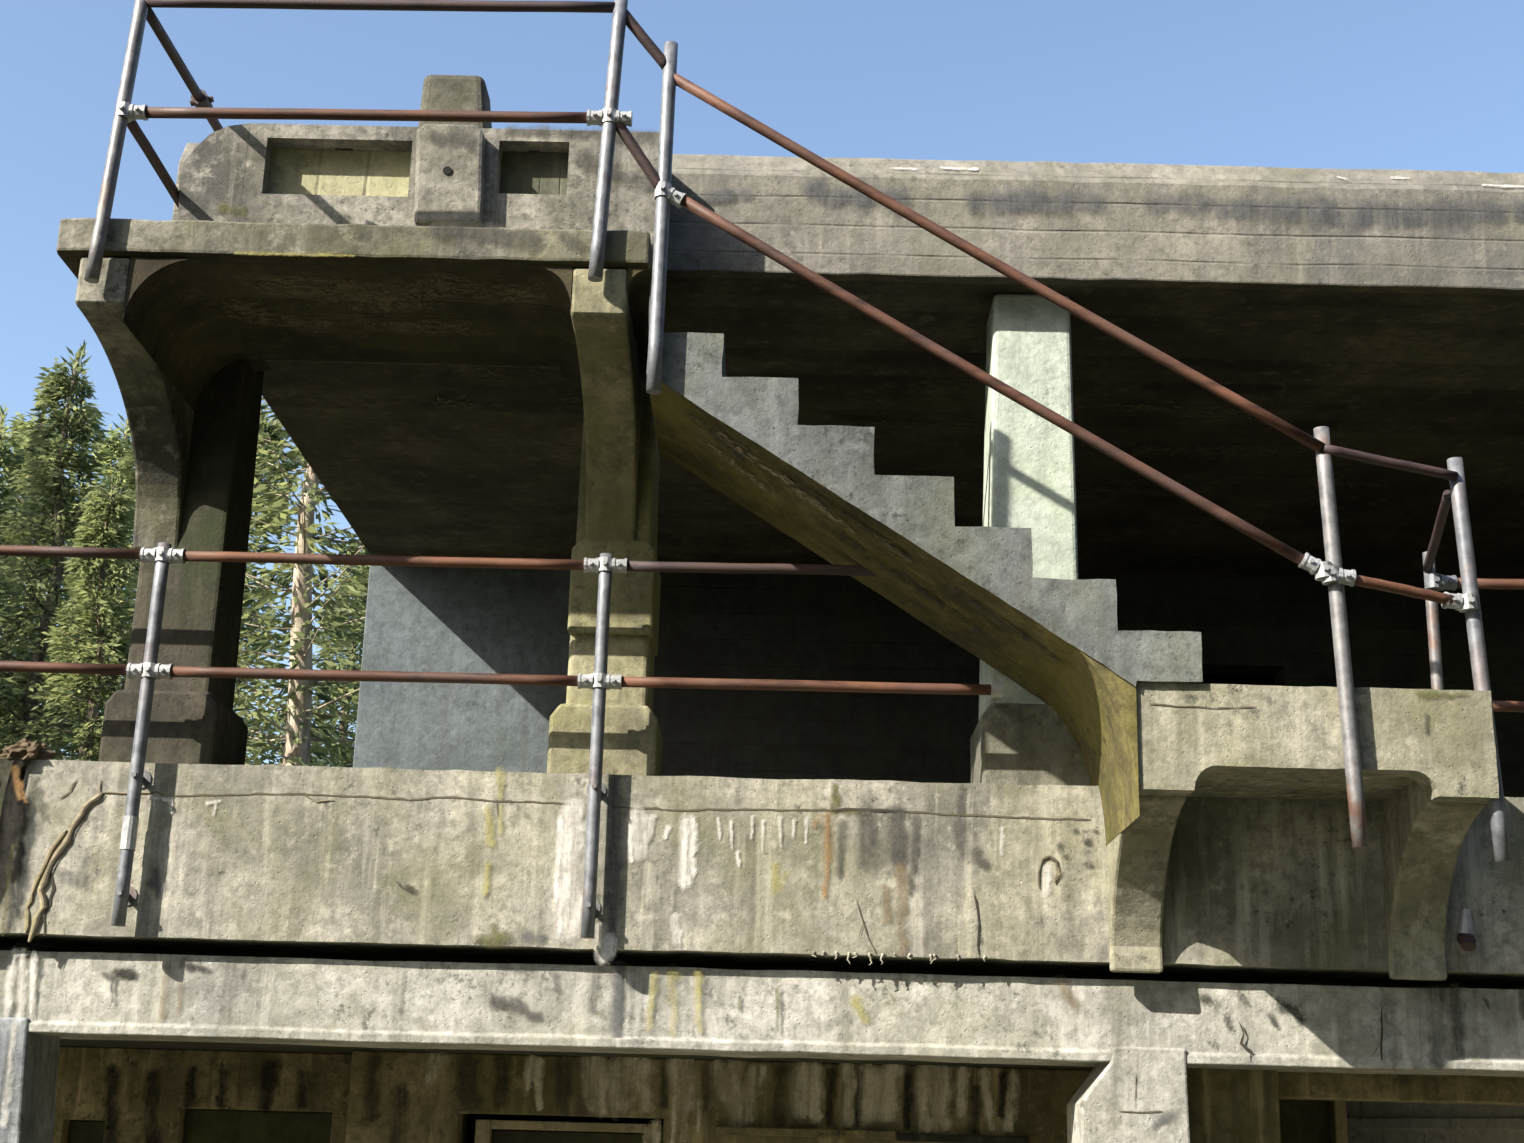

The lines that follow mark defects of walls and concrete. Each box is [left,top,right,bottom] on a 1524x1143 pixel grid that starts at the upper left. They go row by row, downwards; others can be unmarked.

leakage [0,761,30,905]
crack [24,780,1090,942]
leakage [526,774,697,1038]
crack [856,899,877,956]
crack [973,895,981,958]
leakage [0,949,38,1125]
leakage [104,1064,160,1143]
leakage [216,1061,282,1113]
leakage [365,1055,408,1141]
leakage [426,1053,701,1143]
leakage [714,1060,1018,1134]